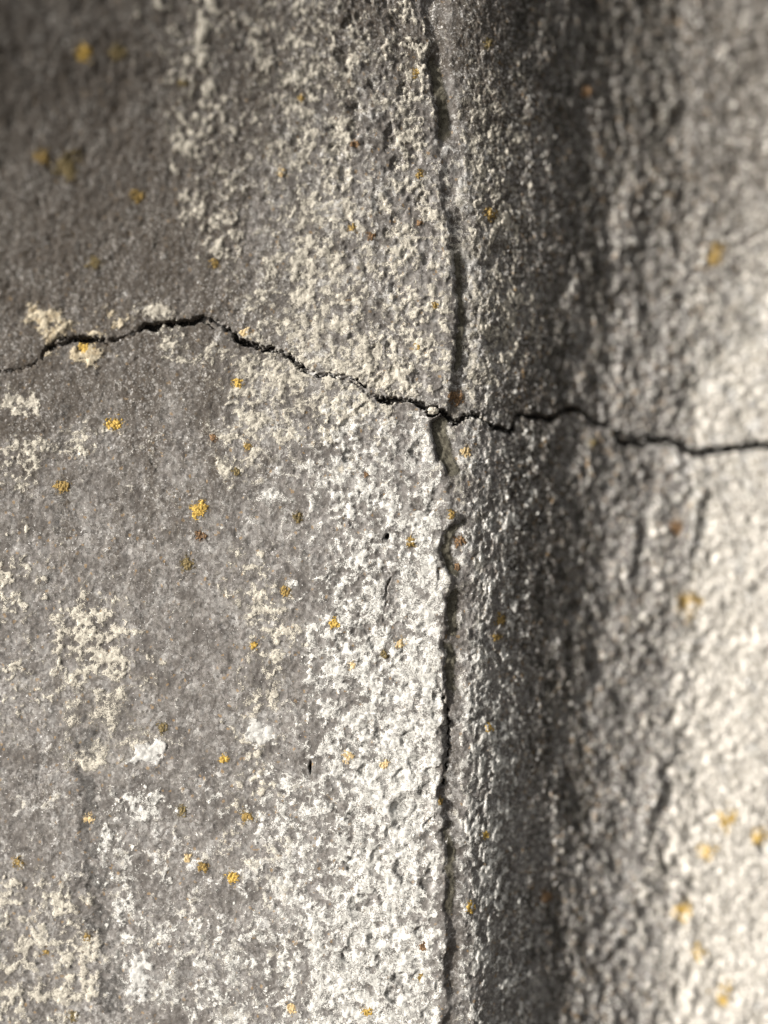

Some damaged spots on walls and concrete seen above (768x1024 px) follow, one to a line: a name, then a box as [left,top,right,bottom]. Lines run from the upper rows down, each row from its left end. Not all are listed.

crack [35,316,768,458]
crack [441,696,451,784]